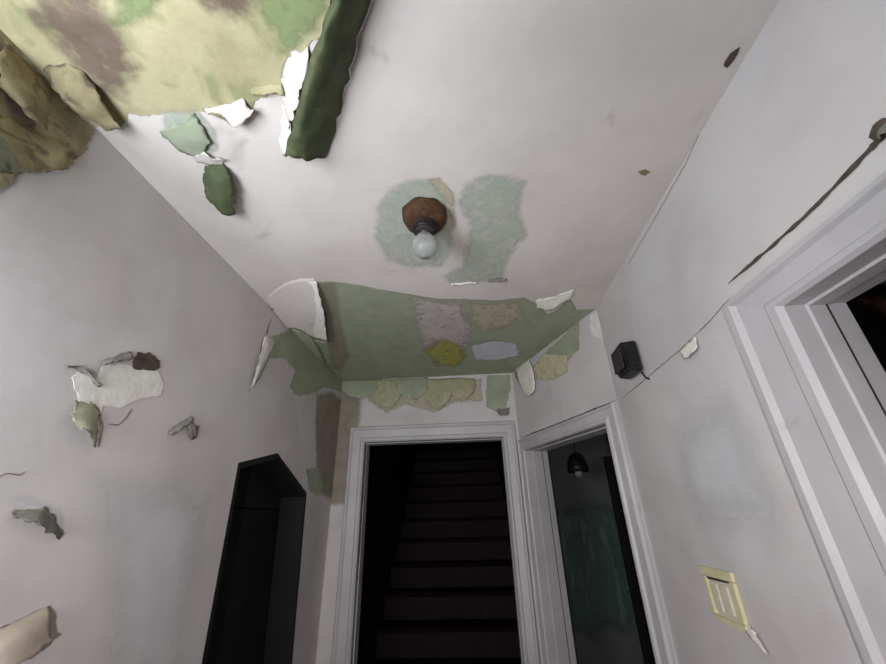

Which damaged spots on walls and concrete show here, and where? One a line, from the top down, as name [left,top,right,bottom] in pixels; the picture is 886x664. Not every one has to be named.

peeling [0,0,371,216]
peeling [377,177,525,286]
crack [526,118,886,436]
flaking render [65,351,164,448]
peeling [169,416,198,440]
peeling [250,278,603,416]
peeling [12,500,64,540]
peeling [0,606,53,664]